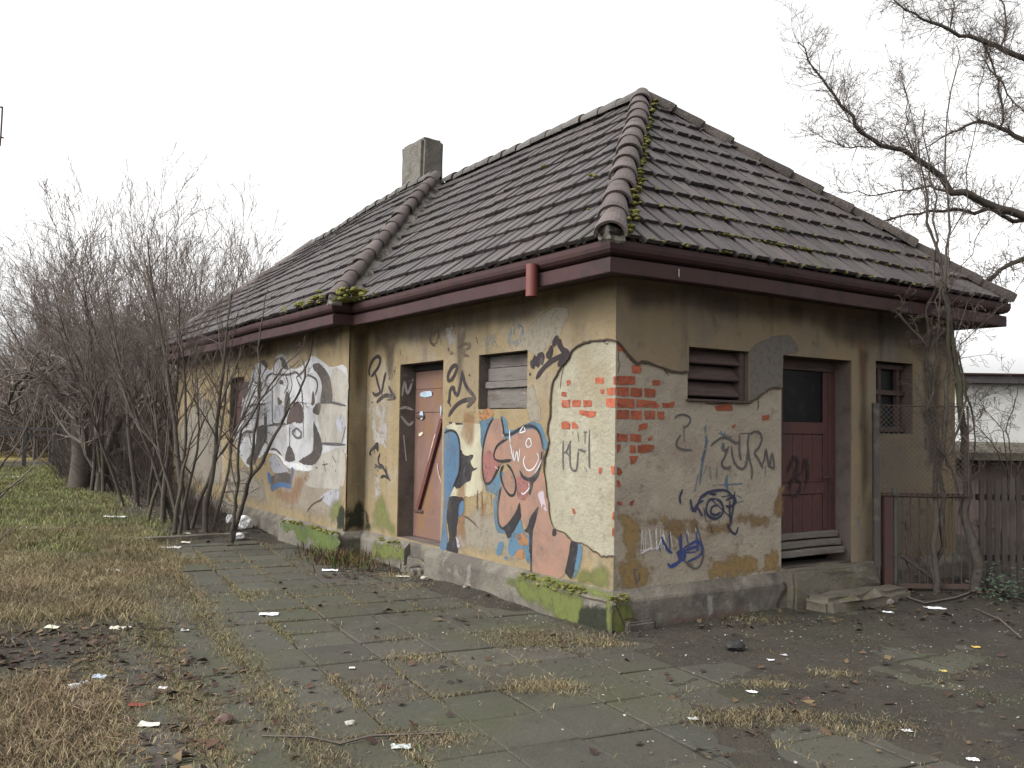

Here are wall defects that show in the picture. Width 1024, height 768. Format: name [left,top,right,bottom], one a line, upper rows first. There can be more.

flaking render [545,340,784,606]
damp [578,606,608,632]